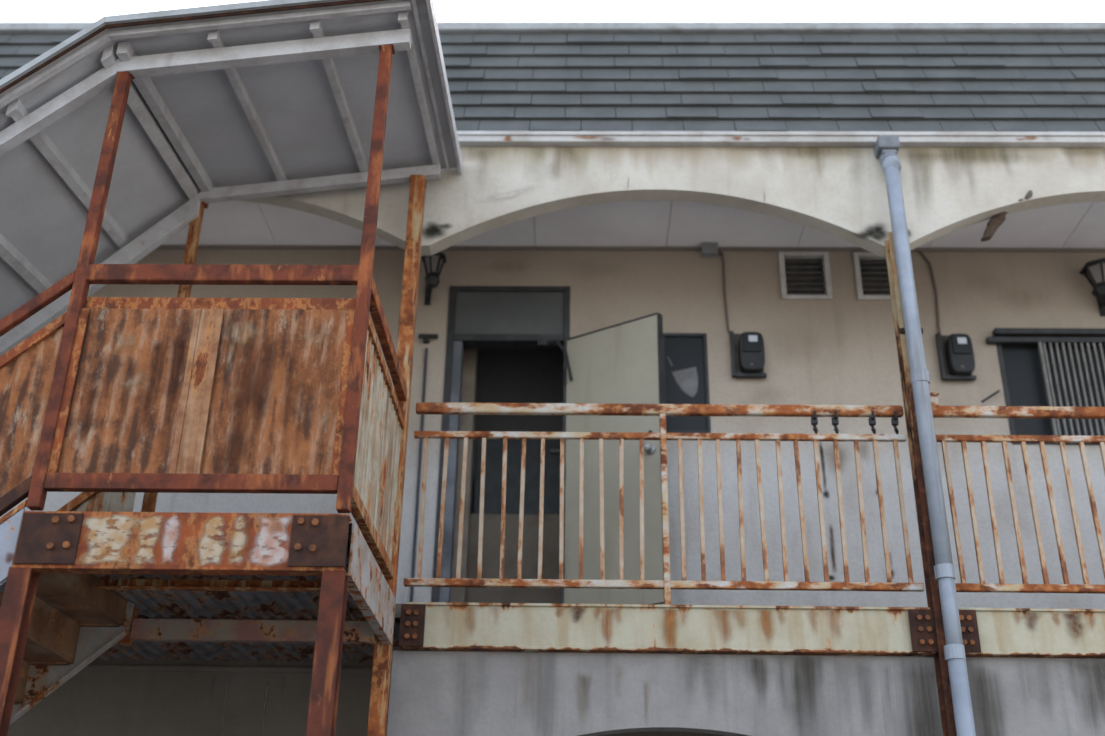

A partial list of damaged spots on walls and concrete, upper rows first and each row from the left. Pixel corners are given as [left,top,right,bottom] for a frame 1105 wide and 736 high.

rust [144,343,160,414]
rust [167,338,182,410]
rust [237,344,273,414]
rust [227,433,242,460]
peeling [82,515,179,564]
peeling [199,516,290,565]
rust [666,610,675,645]
rust [762,611,771,634]
rust [1055,614,1092,634]